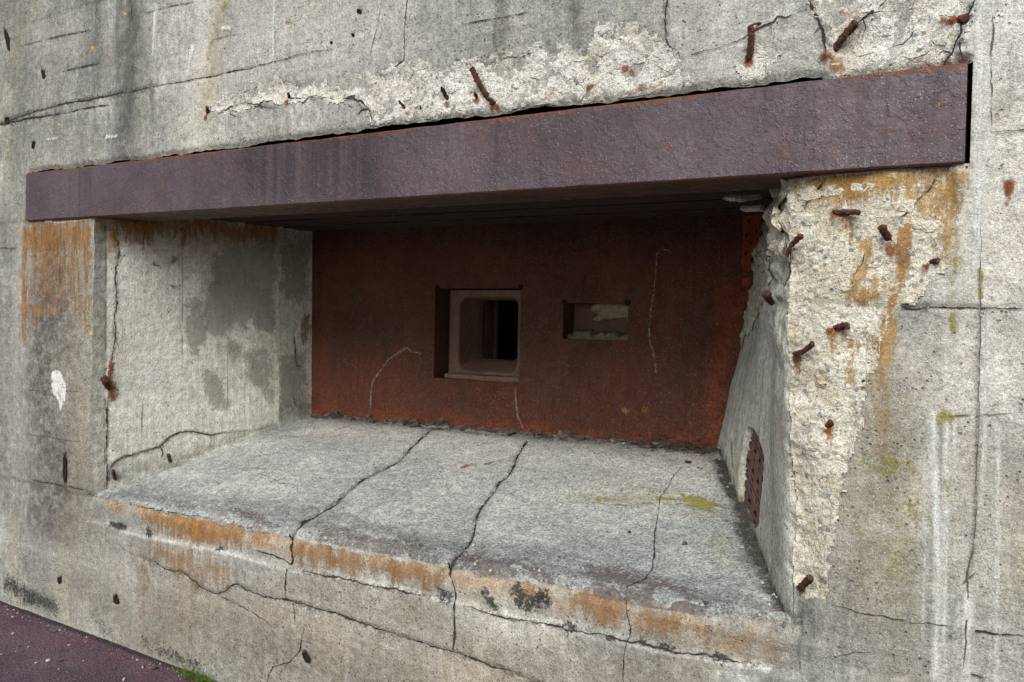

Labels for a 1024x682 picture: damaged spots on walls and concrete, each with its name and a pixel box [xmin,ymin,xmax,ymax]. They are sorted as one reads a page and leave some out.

spalling [208,21,701,126]
spalling [734,25,781,85]
spalling [806,0,977,78]
corrosion [20,218,90,340]
crack [111,228,125,359]
corrosion [796,168,970,424]
spalling [740,166,964,600]
crack [834,228,1024,678]
corrosion [111,503,270,587]
corrosion [294,540,444,590]
crack [111,428,758,682]
corrosion [569,590,626,627]